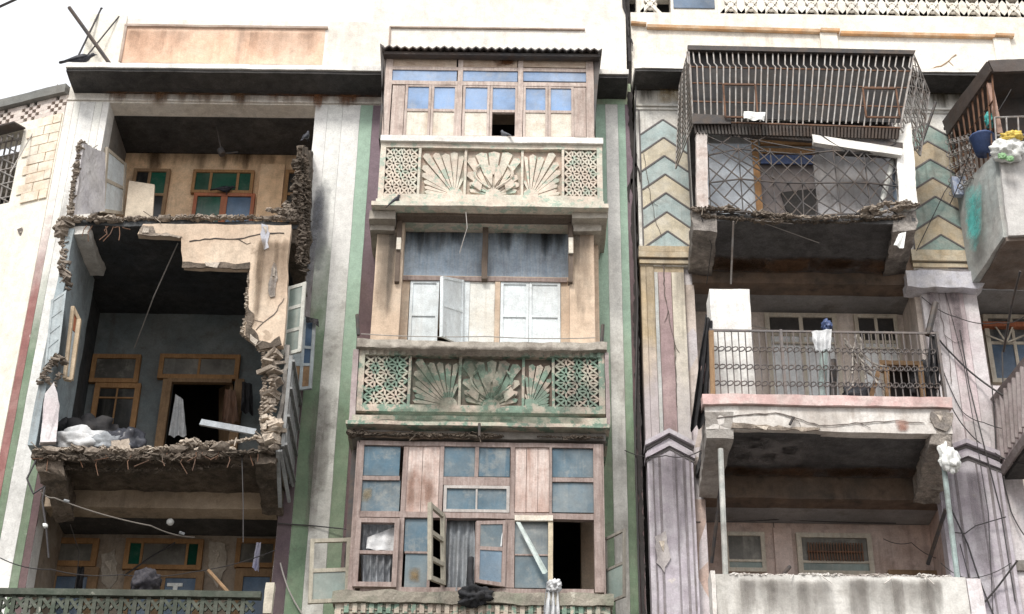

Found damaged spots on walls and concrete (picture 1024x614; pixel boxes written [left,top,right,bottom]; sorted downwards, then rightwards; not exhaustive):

spalling [52,139,312,291]
spalling [690,199,920,226]
crack [189,232,284,244]
crack [717,412,923,428]
spalling [31,431,276,476]